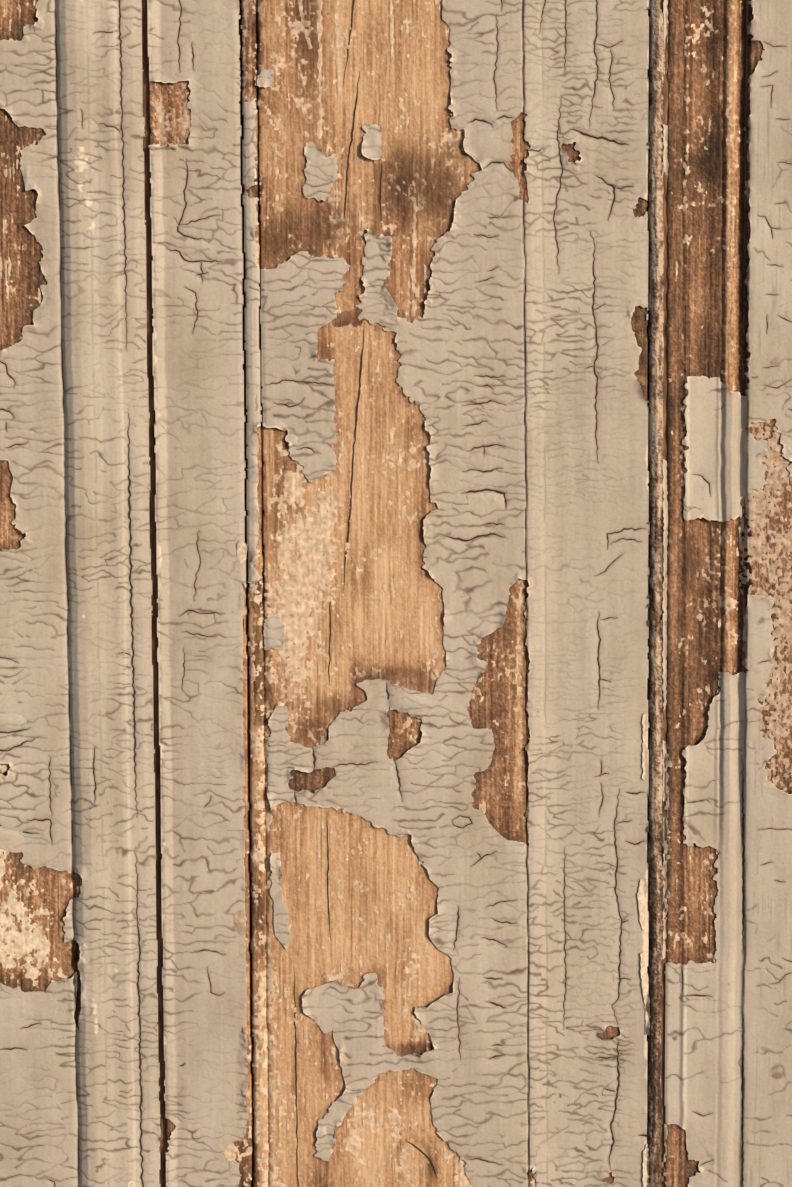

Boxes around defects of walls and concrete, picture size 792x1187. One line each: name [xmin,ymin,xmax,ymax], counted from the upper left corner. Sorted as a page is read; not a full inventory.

peeling [0,108,48,350]
crack [81,0,127,345]
peeling [149,81,191,148]
crack [483,0,628,265]
crack [118,413,138,814]
crack [328,322,365,681]
peeling [223,0,482,1187]
peeling [467,578,530,847]
peeling [662,0,792,967]
peeling [0,848,82,1029]
crack [135,854,144,1187]
crack [596,762,650,1170]